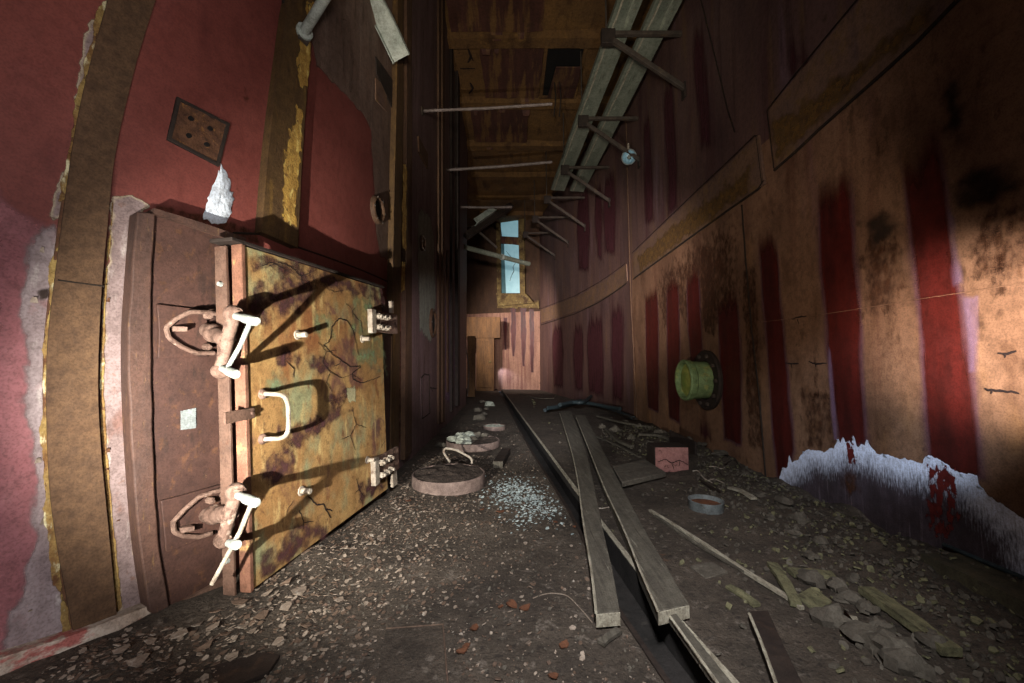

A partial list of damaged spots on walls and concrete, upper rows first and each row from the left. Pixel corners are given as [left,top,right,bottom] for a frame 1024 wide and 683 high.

peeling [74,20,94,99]
crack [261,262,312,286]
rust [276,347,334,374]
crack [318,290,380,389]
peeling [3,172,64,649]
rust [261,388,350,485]
rust [260,523,327,577]
crack [287,496,332,531]
rust [358,477,386,503]
peeling [779,436,1024,576]